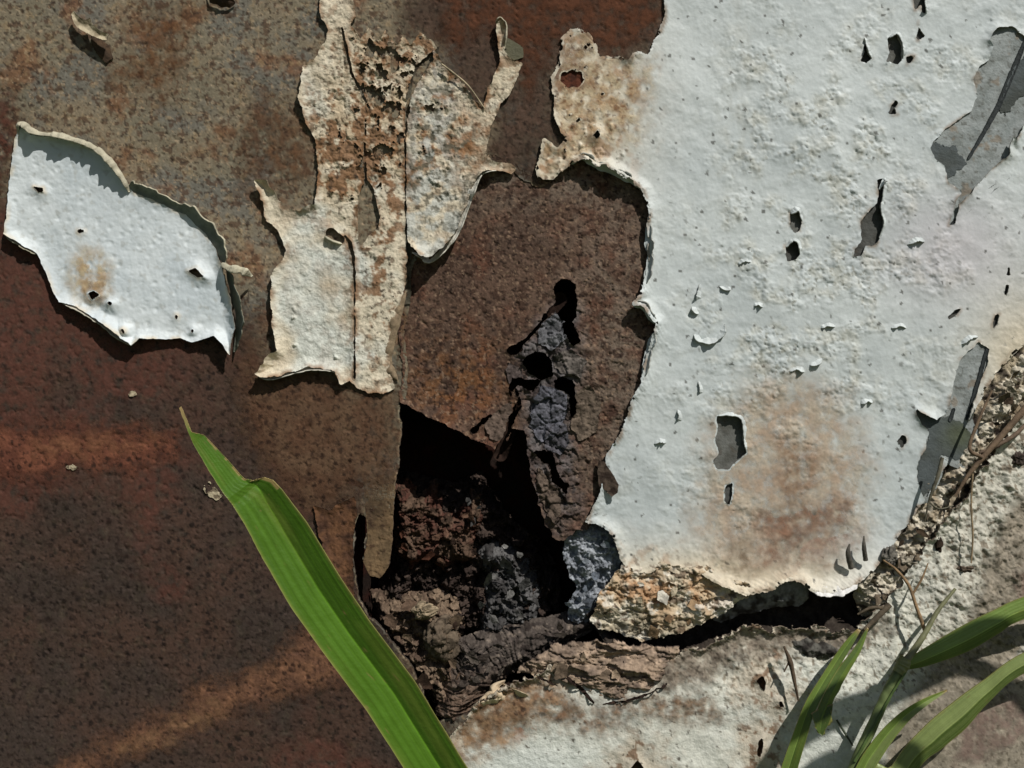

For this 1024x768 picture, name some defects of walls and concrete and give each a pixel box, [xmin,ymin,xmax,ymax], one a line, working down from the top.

peeling [3,121,253,355]
peeling [254,0,524,394]
peeling [854,177,888,257]
peeling [931,27,1024,225]
rust [0,0,660,768]
peeling [713,411,748,470]
rust [706,386,862,564]
peeling [916,335,989,504]
crack [896,346,1024,541]
peeling [590,561,752,642]
rust [643,698,712,717]
crack [586,580,869,660]